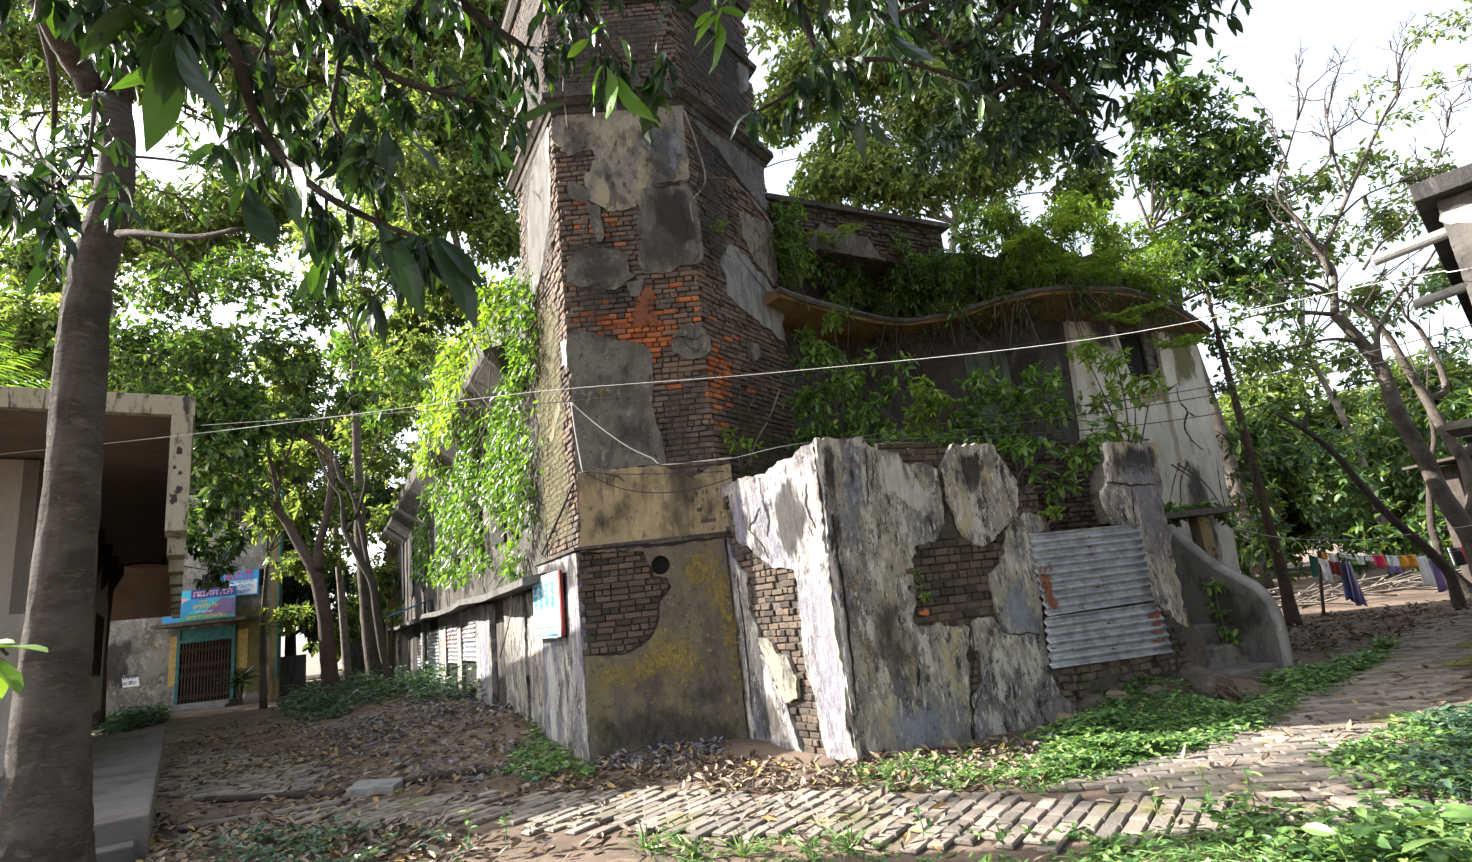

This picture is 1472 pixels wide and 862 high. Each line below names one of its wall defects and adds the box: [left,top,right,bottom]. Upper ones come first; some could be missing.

flaking render [527,105,785,362]
flaking render [549,330,827,755]
spalling [906,488,1039,690]
corrosion [1039,563,1058,610]